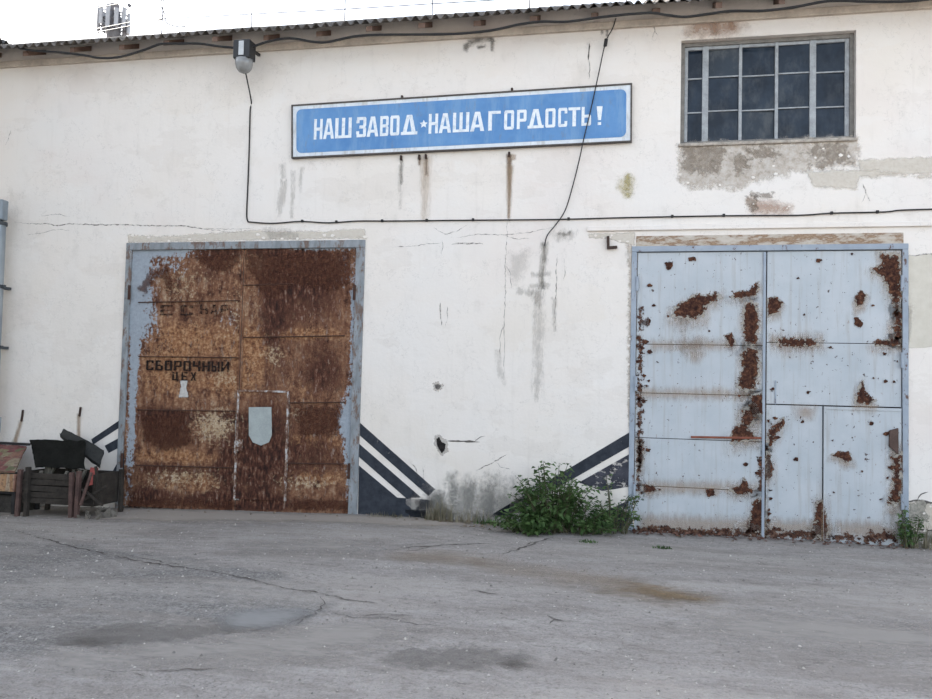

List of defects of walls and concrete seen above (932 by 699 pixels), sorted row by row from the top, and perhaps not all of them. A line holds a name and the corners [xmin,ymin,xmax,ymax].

flaking render [678,141,906,190]
crack [27,214,249,235]
corrosion [873,253,902,362]
corrosion [635,283,898,543]
spalling [434,435,449,455]
corrosion [879,455,903,504]